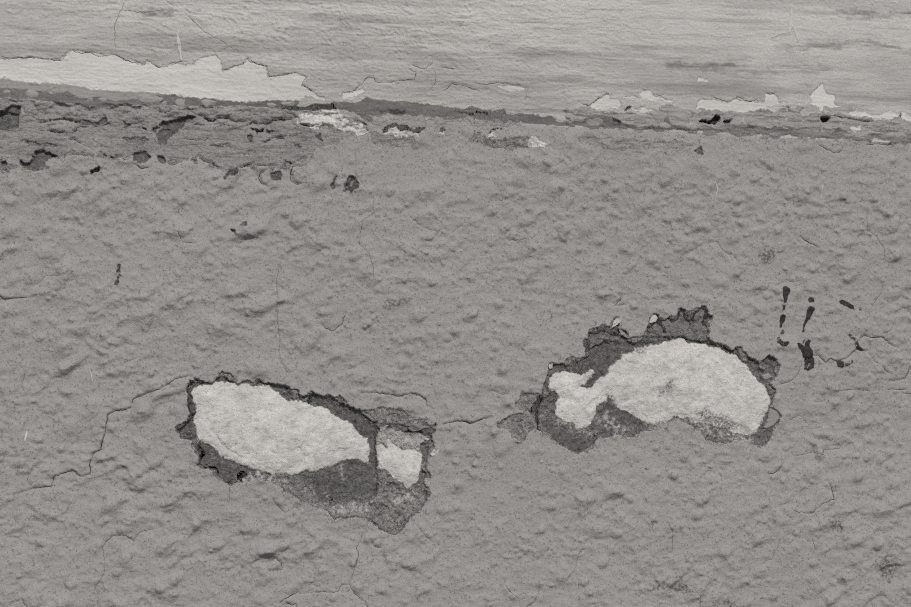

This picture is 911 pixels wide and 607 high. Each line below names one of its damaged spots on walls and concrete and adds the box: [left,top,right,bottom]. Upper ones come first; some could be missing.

flaking render [565,83,911,155]
crack [17,376,186,494]
spalling [175,369,446,535]
spalling [497,305,781,454]
crack [780,307,911,421]